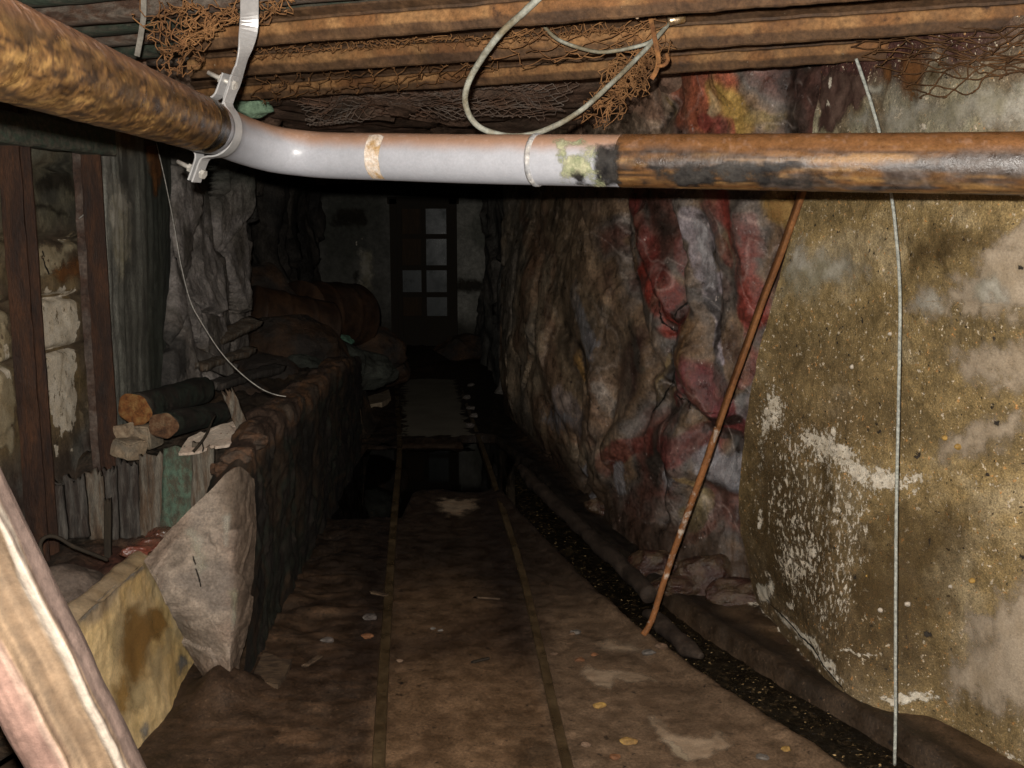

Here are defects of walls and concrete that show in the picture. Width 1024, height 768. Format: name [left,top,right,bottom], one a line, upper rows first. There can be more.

water stain [708,384,947,638]
crack [767,600,878,688]
efflorescence [879,692,940,706]